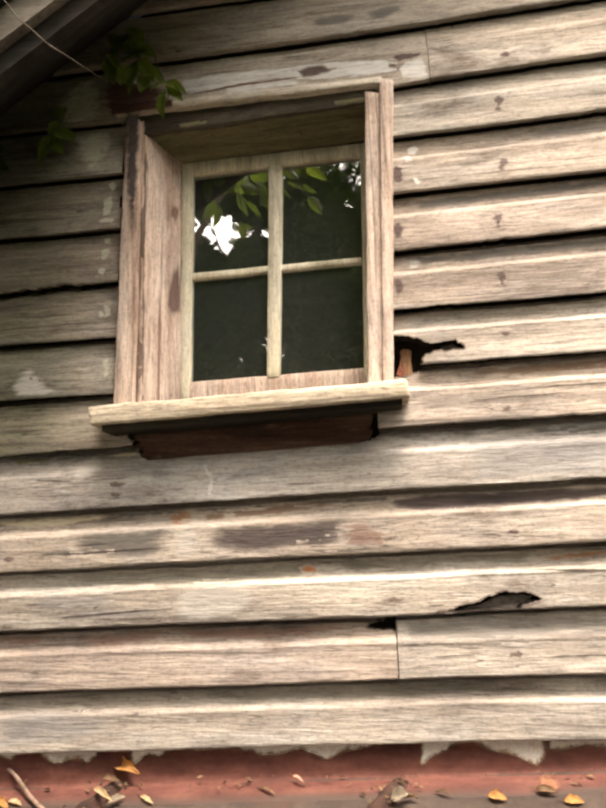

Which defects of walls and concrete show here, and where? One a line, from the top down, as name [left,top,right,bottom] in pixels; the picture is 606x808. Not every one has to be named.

water stain [194,422,606,575]
water stain [38,509,182,565]
peeling [42,752,96,762]
peeling [132,750,164,763]
peeling [241,744,367,758]
peeling [421,742,458,763]
peeling [473,740,606,764]